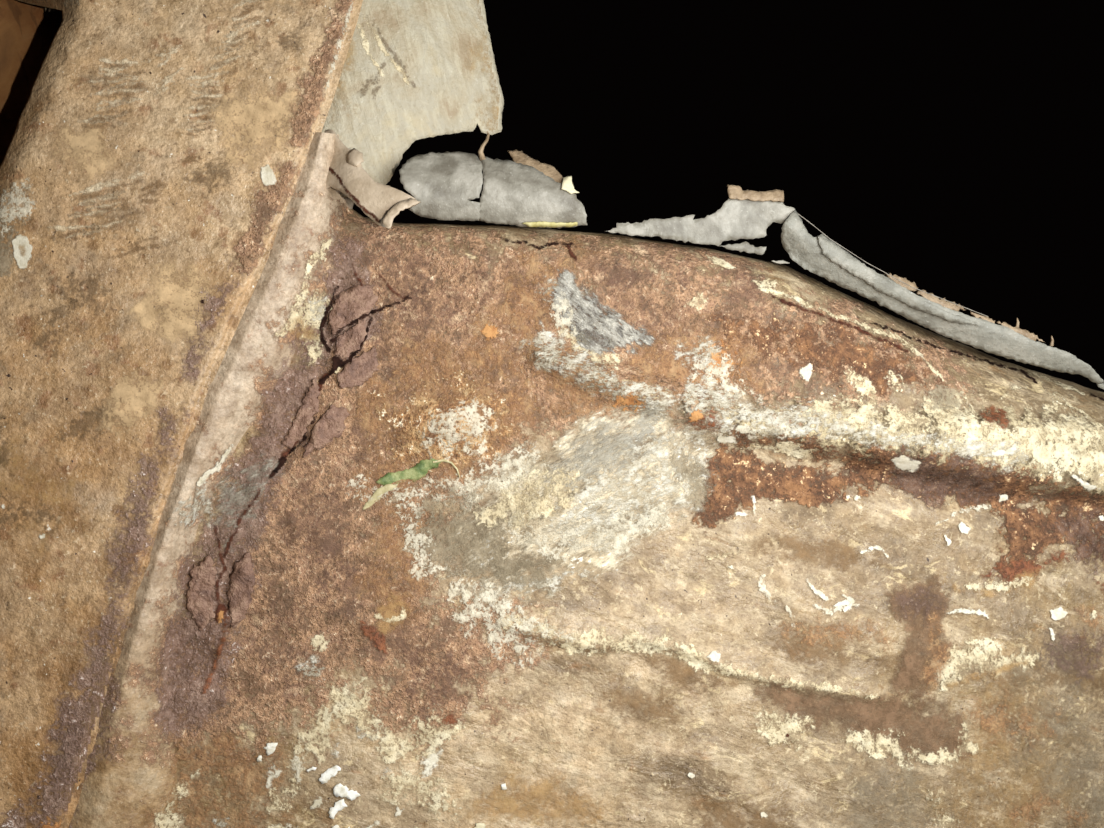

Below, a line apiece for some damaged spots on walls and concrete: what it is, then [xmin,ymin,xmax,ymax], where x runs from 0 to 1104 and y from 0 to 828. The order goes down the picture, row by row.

peeling [322,0,587,229]
peeling [608,184,1104,389]
peeling [844,367,877,398]
peeling [717,435,737,444]
peeling [753,441,817,458]
peeling [892,455,921,472]
peeling [992,442,1018,457]
crack [202,267,412,694]
peeling [1072,475,1096,490]
rust [0,192,1104,828]
leakage [754,676,971,761]